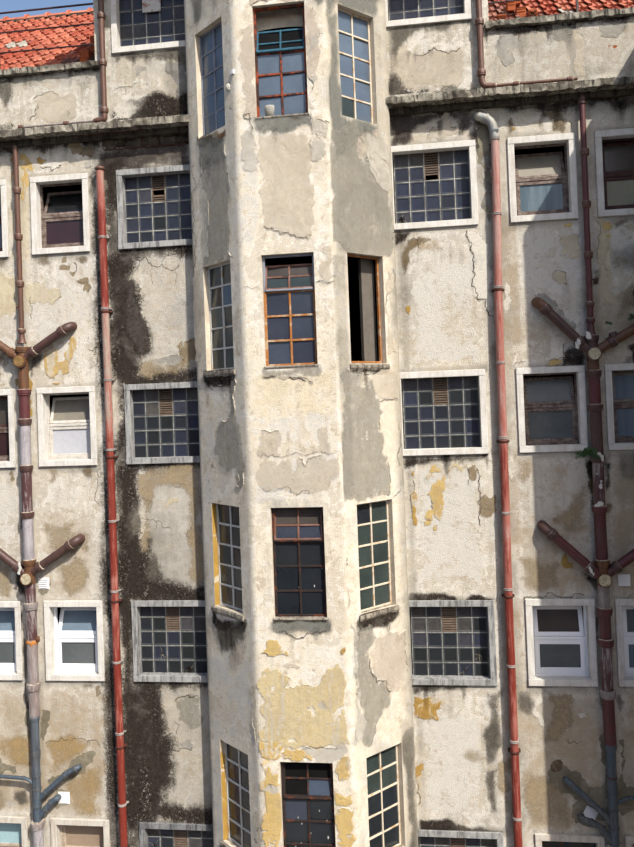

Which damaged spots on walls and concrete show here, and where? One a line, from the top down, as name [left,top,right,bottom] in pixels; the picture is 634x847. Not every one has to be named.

leakage [111,91,188,120]
crack [466,230,494,318]
flaking render [211,380,245,488]
leakage [31,129,247,847]
peeling [410,464,477,531]
flaking render [479,495,497,518]
leakage [272,620,331,634]
peeling [250,624,390,847]
peeling [413,694,447,720]
peeling [408,763,424,805]